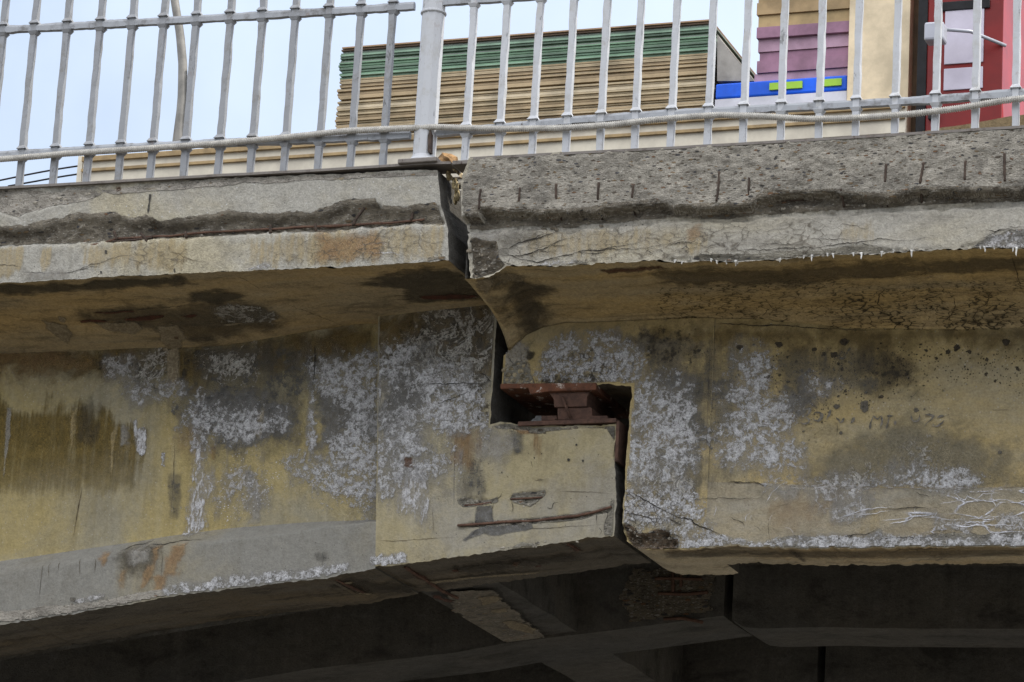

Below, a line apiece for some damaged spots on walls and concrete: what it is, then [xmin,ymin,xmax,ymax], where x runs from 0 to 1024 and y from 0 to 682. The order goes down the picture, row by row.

spalling [0,172,444,246]
spalling [453,128,1024,294]
water stain [29,270,68,280]
crack [499,221,1024,331]
water stain [0,305,523,537]
spalling [494,423,615,439]
water stain [505,327,1008,548]
spalling [457,490,678,549]
crack [838,489,1024,541]
water stain [369,551,407,566]